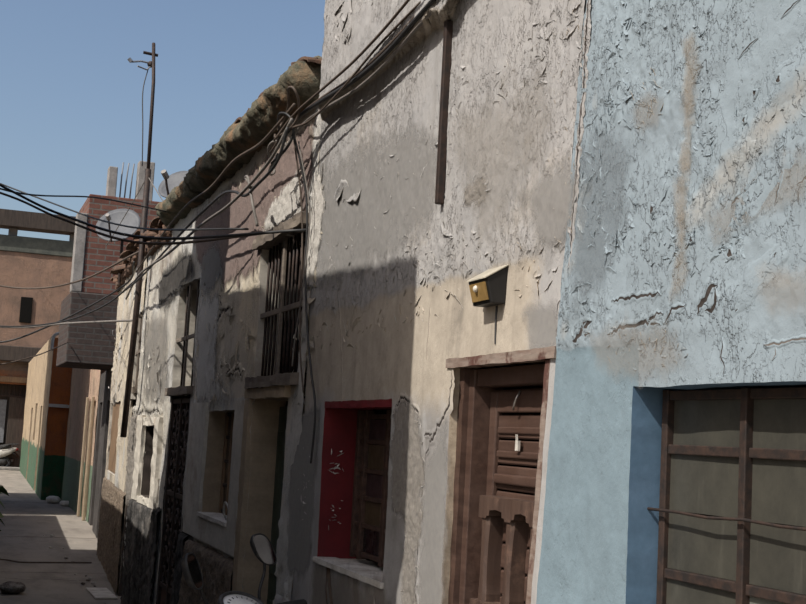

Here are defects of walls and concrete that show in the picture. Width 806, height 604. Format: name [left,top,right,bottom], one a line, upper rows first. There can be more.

peeling [326,2,352,54]
peeling [524,0,586,119]
spalling [119,162,135,198]
crack [568,0,591,268]
peeling [542,0,670,274]
peeling [108,319,123,407]
flaking render [193,125,325,382]
peeling [372,218,488,331]
crack [553,252,777,349]
crack [719,337,727,376]
crack [763,334,806,361]
flaking render [125,412,146,505]